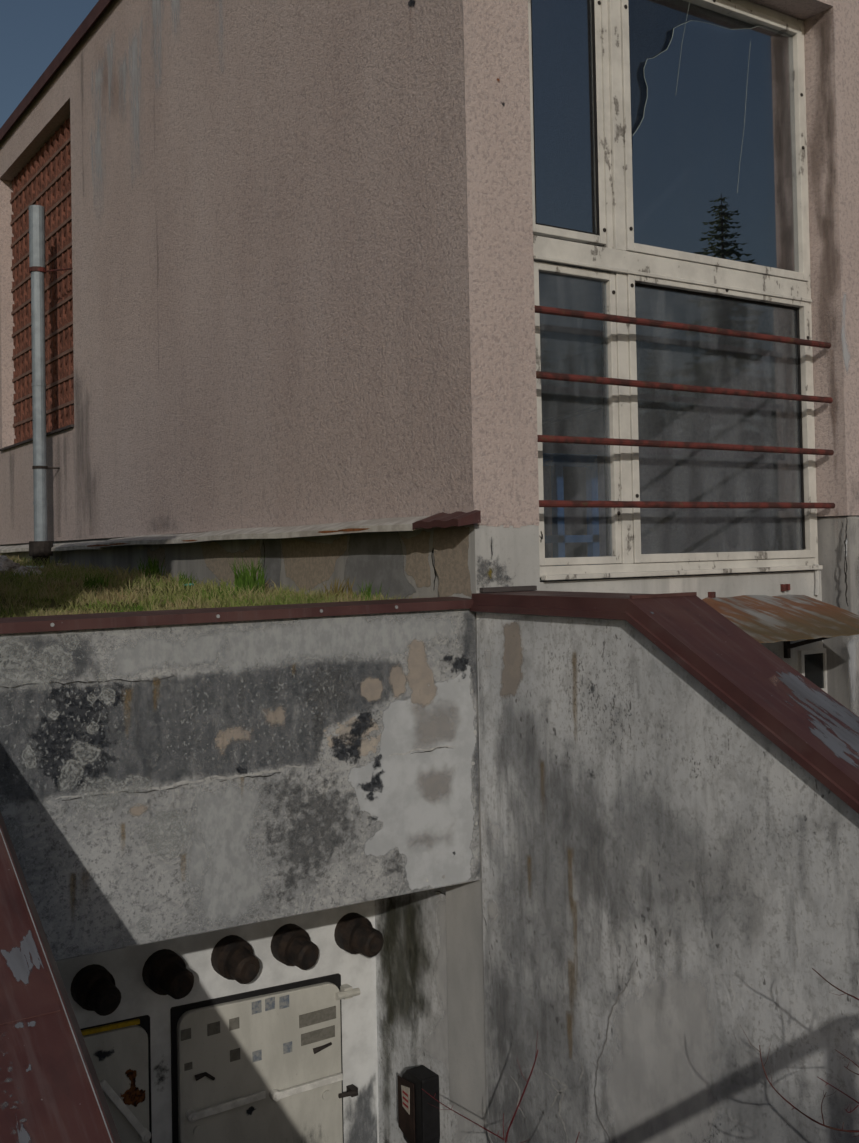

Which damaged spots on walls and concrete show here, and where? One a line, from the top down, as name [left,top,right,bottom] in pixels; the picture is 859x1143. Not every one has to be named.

peeling [500,621,523,697]
peeling [215,727,252,751]
peeling [264,707,285,725]
peeling [776,671,859,768]
peeling [321,665,478,896]
peeling [1,930,44,985]
crack [594,956,636,1143]
peeling [4,1079,31,1143]
rust [120,1069,146,1107]